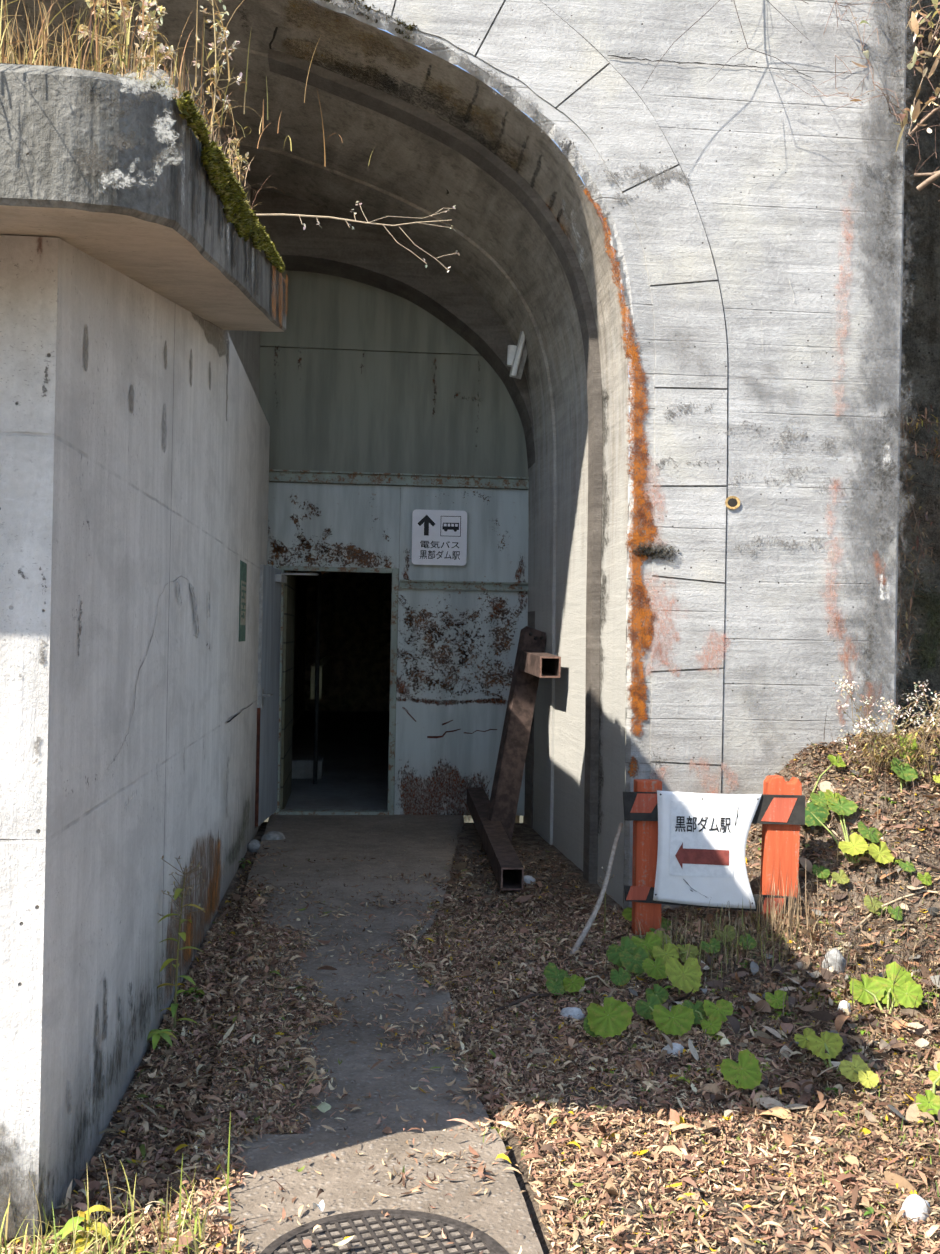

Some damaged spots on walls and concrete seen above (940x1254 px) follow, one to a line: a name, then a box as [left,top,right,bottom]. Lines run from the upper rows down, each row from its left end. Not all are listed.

crack [607,55,814,79]
corrosion [272,266,288,329]
damp [845,0,915,722]
corrosion [583,189,676,737]
corrosion [490,556,527,618]
crack [107,576,199,769]
corrosion [396,678,506,706]
corrosion [395,759,490,823]
corrosion [628,757,638,777]
corrosion [165,832,221,999]